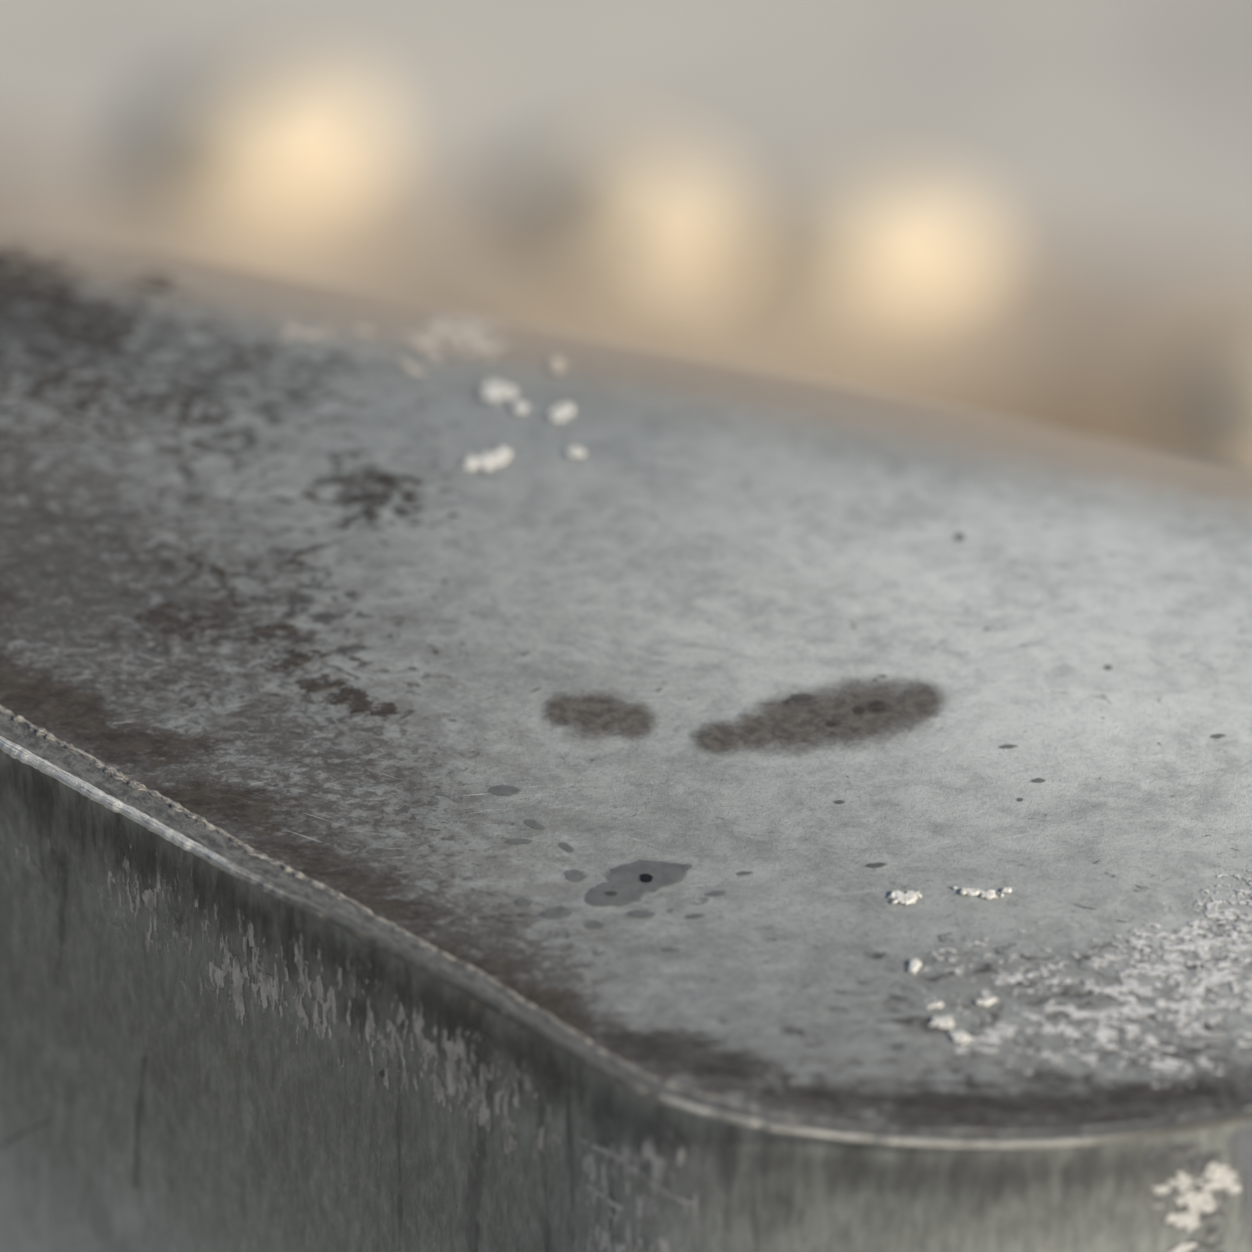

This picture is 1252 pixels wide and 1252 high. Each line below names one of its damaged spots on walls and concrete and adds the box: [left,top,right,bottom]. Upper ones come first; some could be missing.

water stain [547,695,653,736]
water stain [697,682,940,752]
water stain [489,785,520,796]
water stain [506,819,545,844]
water stain [516,899,571,919]
water stain [565,860,692,918]
peeling [887,890,922,905]
peeling [100,846,562,1168]
peeling [906,869,1252,1088]
peeling [579,1134,685,1252]
peeling [1152,1162,1241,1252]